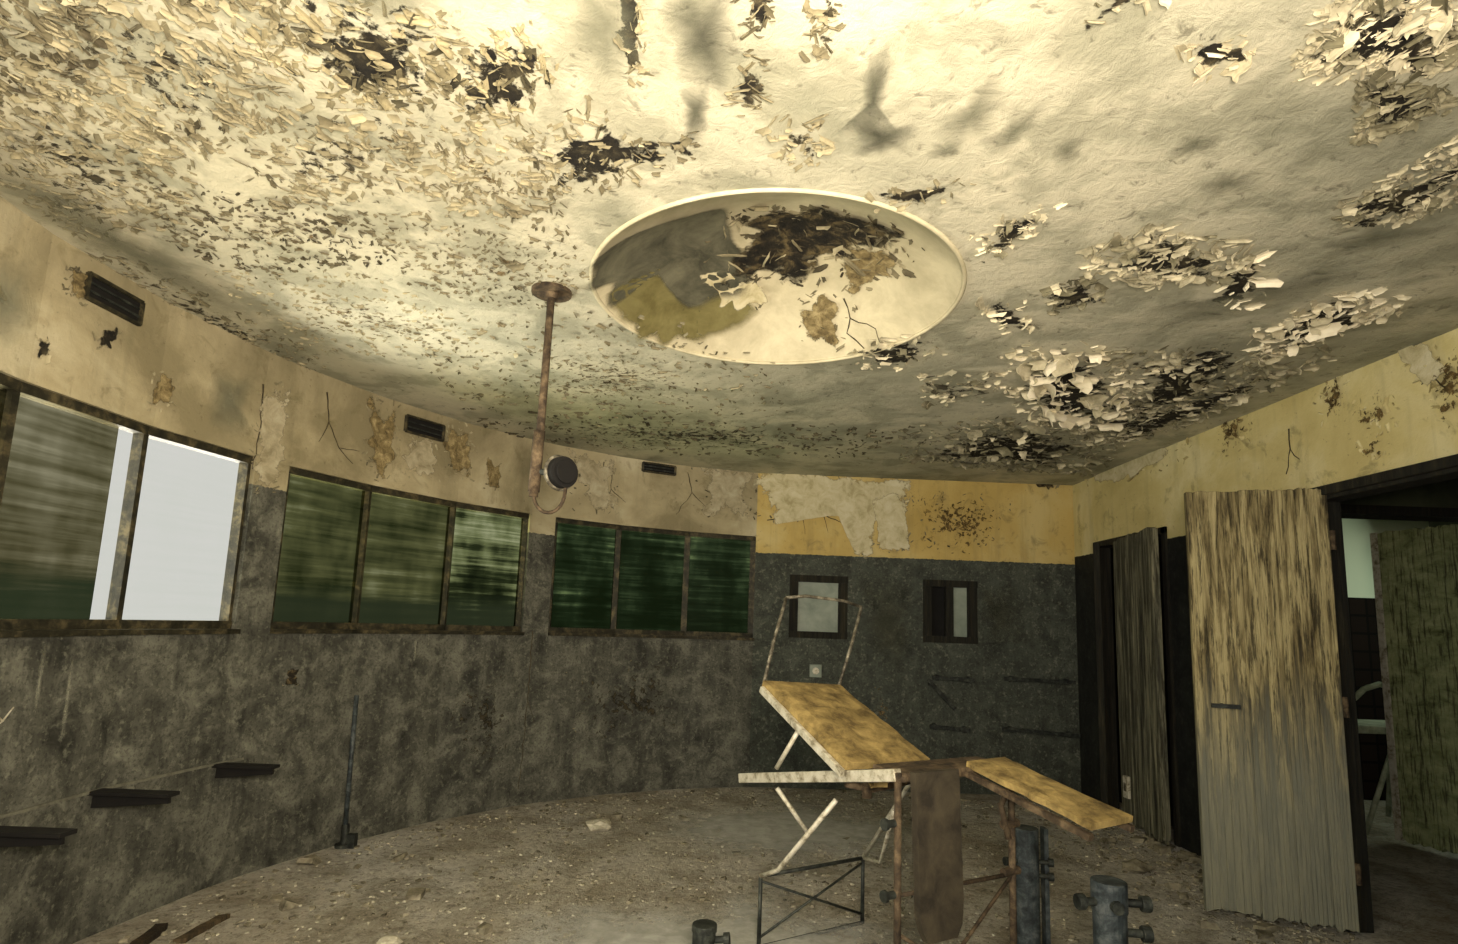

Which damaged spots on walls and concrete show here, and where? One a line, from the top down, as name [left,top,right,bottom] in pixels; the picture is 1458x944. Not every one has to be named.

peeling [0,0,1412,556]
peeling [1289,0,1458,147]